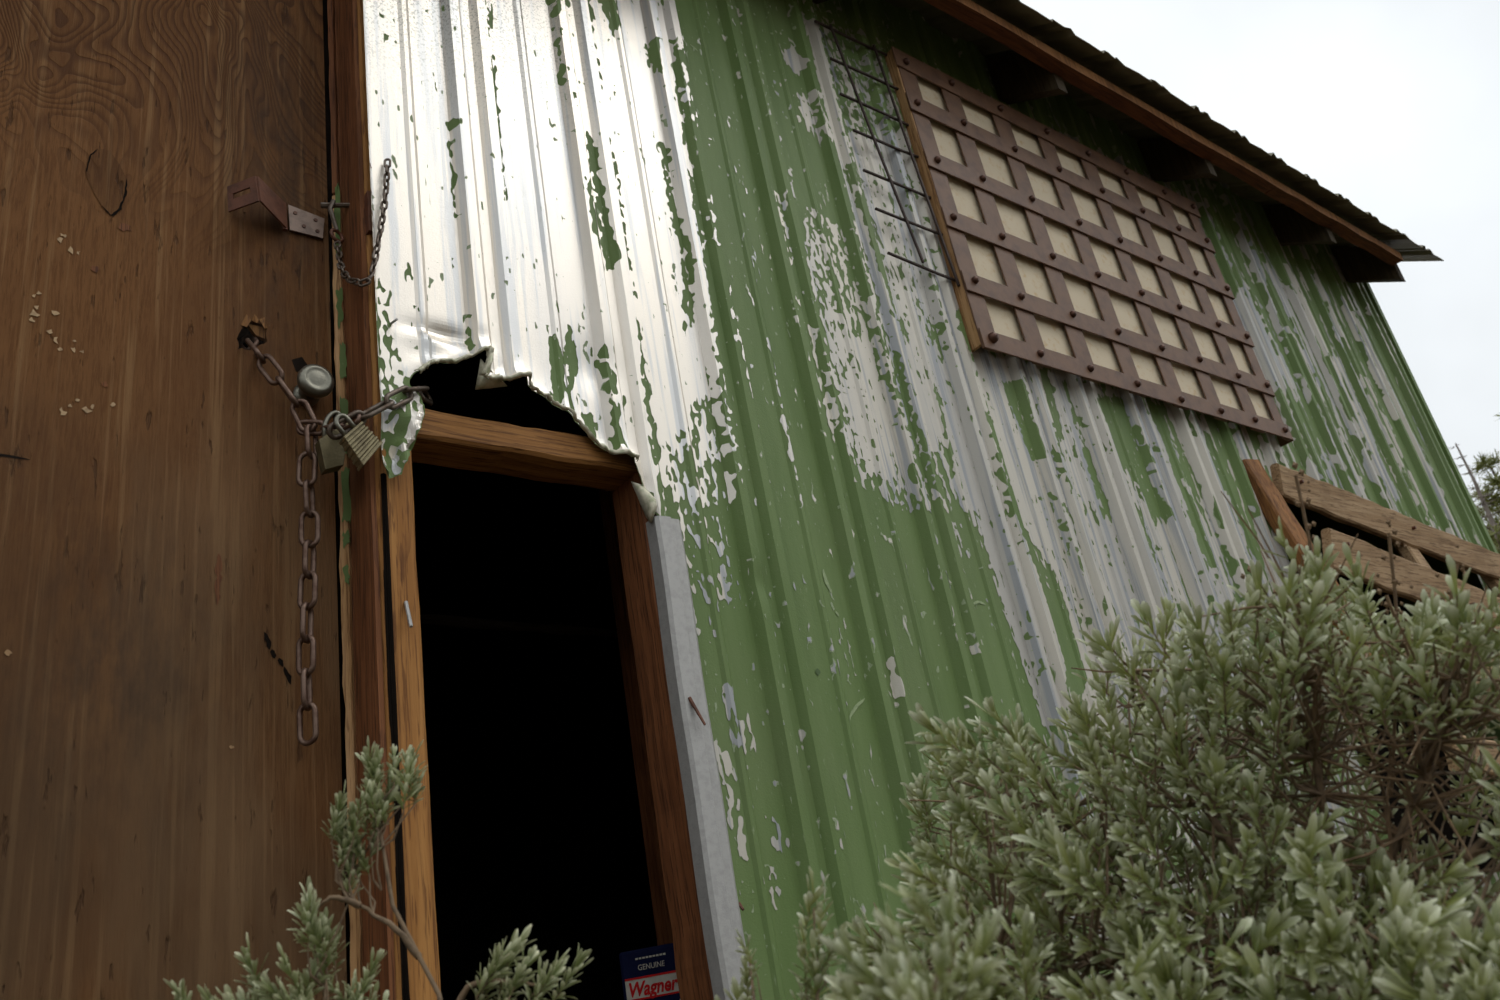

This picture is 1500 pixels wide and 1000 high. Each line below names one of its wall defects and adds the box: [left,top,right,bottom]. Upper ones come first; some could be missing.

peeling [363,0,1500,958]